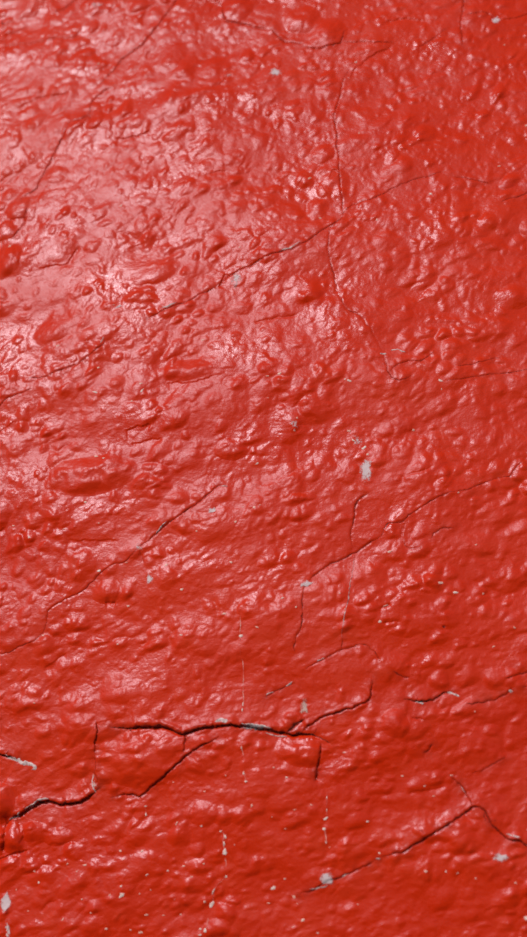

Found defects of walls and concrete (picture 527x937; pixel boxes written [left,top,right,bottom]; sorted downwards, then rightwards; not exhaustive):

crack [6,461,526,823]
crack [0,750,37,770]
crack [309,757,527,892]